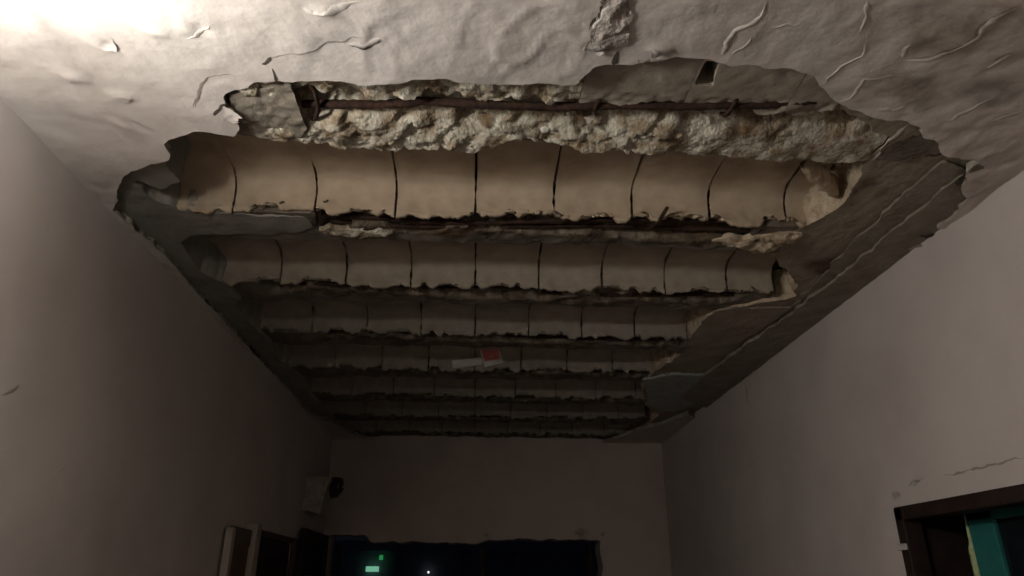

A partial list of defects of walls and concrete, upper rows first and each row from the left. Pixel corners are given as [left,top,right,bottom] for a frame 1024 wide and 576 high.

peeling [581,0,633,57]
spalling [112,84,985,443]